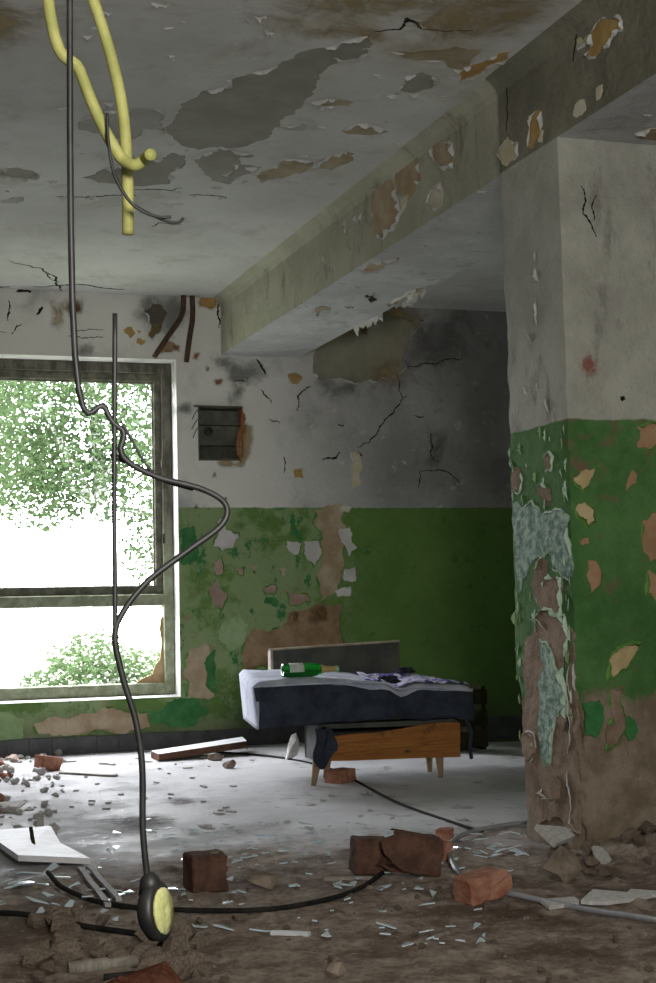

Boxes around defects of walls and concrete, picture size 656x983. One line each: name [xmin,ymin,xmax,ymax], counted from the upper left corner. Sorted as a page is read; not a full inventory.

peeling [78,35,373,205]
crack [374,17,473,32]
peeling [387,46,511,100]
peeling [496,110,544,166]
peeling [573,84,603,118]
peeling [576,14,623,60]
crack [581,186,597,237]
crack [0,261,125,334]
crack [322,358,463,488]
peeling [640,509,656,601]
peeling [0,503,357,740]
peeling [507,425,642,834]